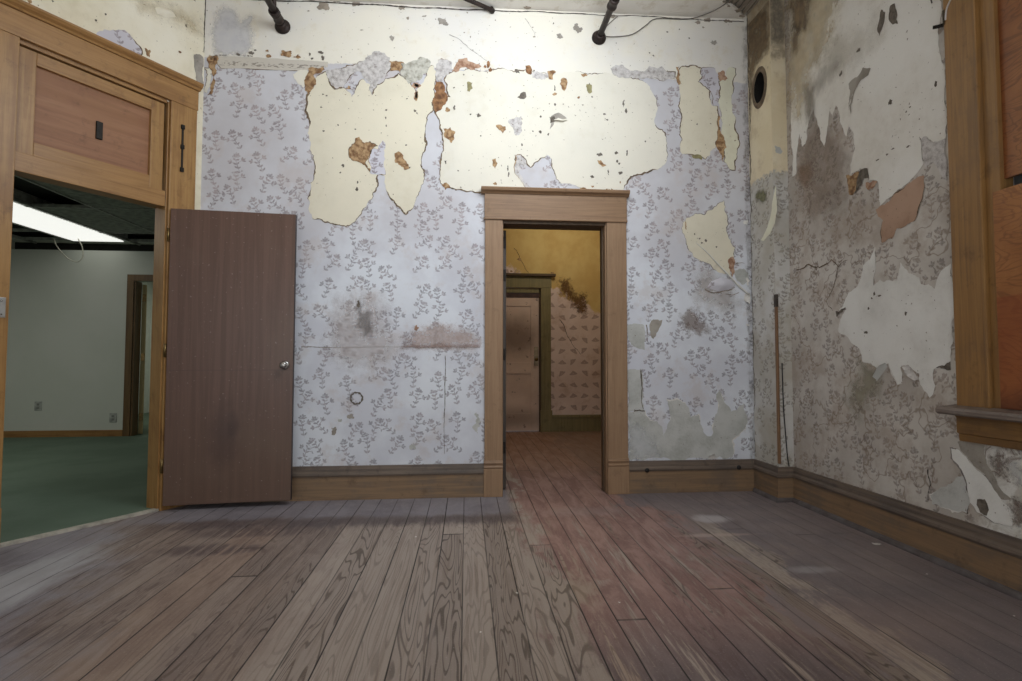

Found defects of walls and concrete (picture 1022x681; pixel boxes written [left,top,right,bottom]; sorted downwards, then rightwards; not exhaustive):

rust [432,80,448,112]
peeling [838,249,954,397]
flaking render [627,369,748,460]
spalling [930,441,1015,527]
damp [1010,501,1022,526]